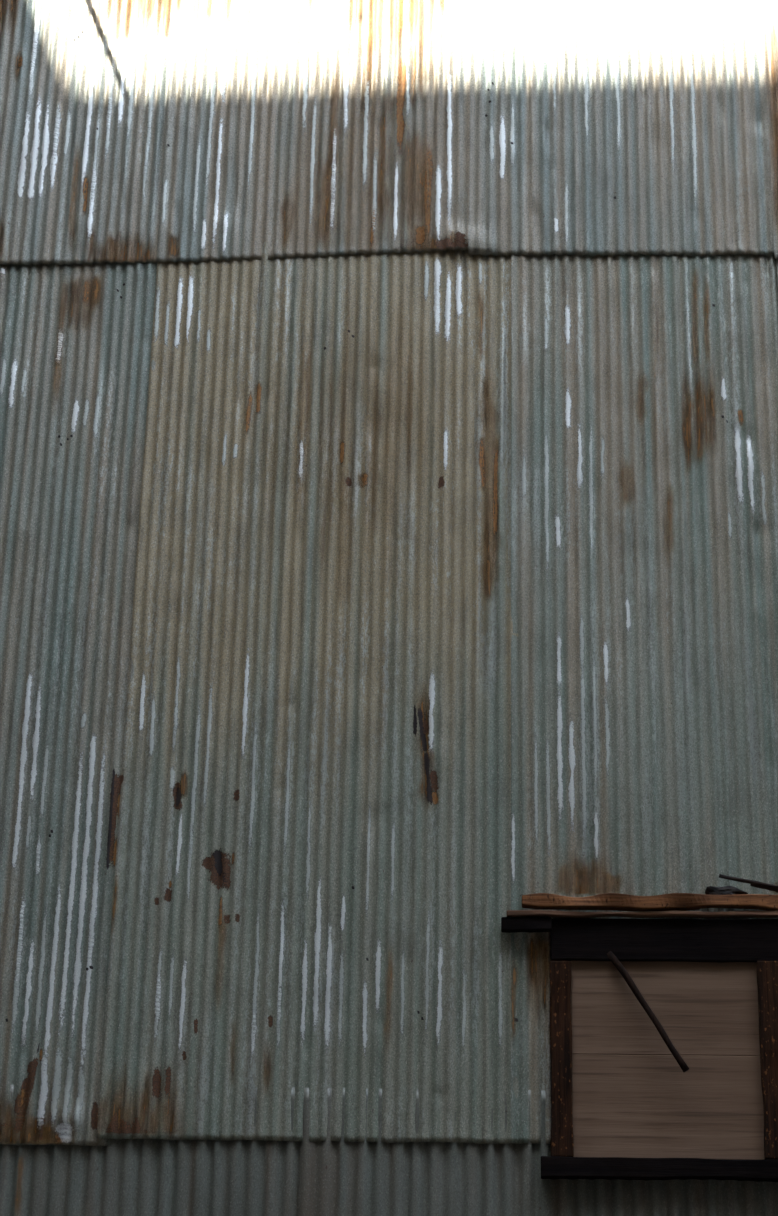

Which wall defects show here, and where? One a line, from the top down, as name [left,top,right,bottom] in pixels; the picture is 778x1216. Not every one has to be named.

rust [413,706,428,737]
rust [170,767,187,806]
rust [429,770,439,805]
rust [202,850,240,958]
rust [0,1049,61,1144]